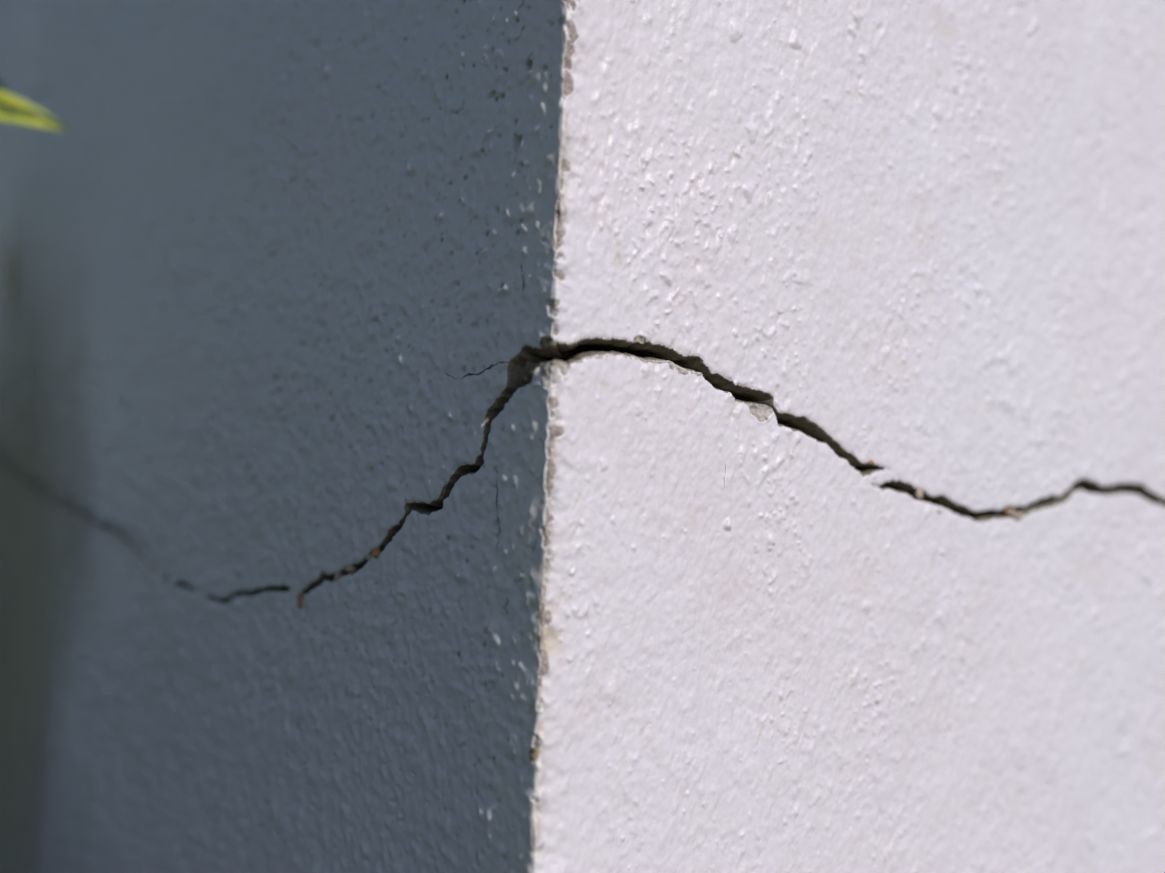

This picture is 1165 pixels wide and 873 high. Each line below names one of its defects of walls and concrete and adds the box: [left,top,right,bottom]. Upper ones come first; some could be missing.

crack [163,336,1165,609]